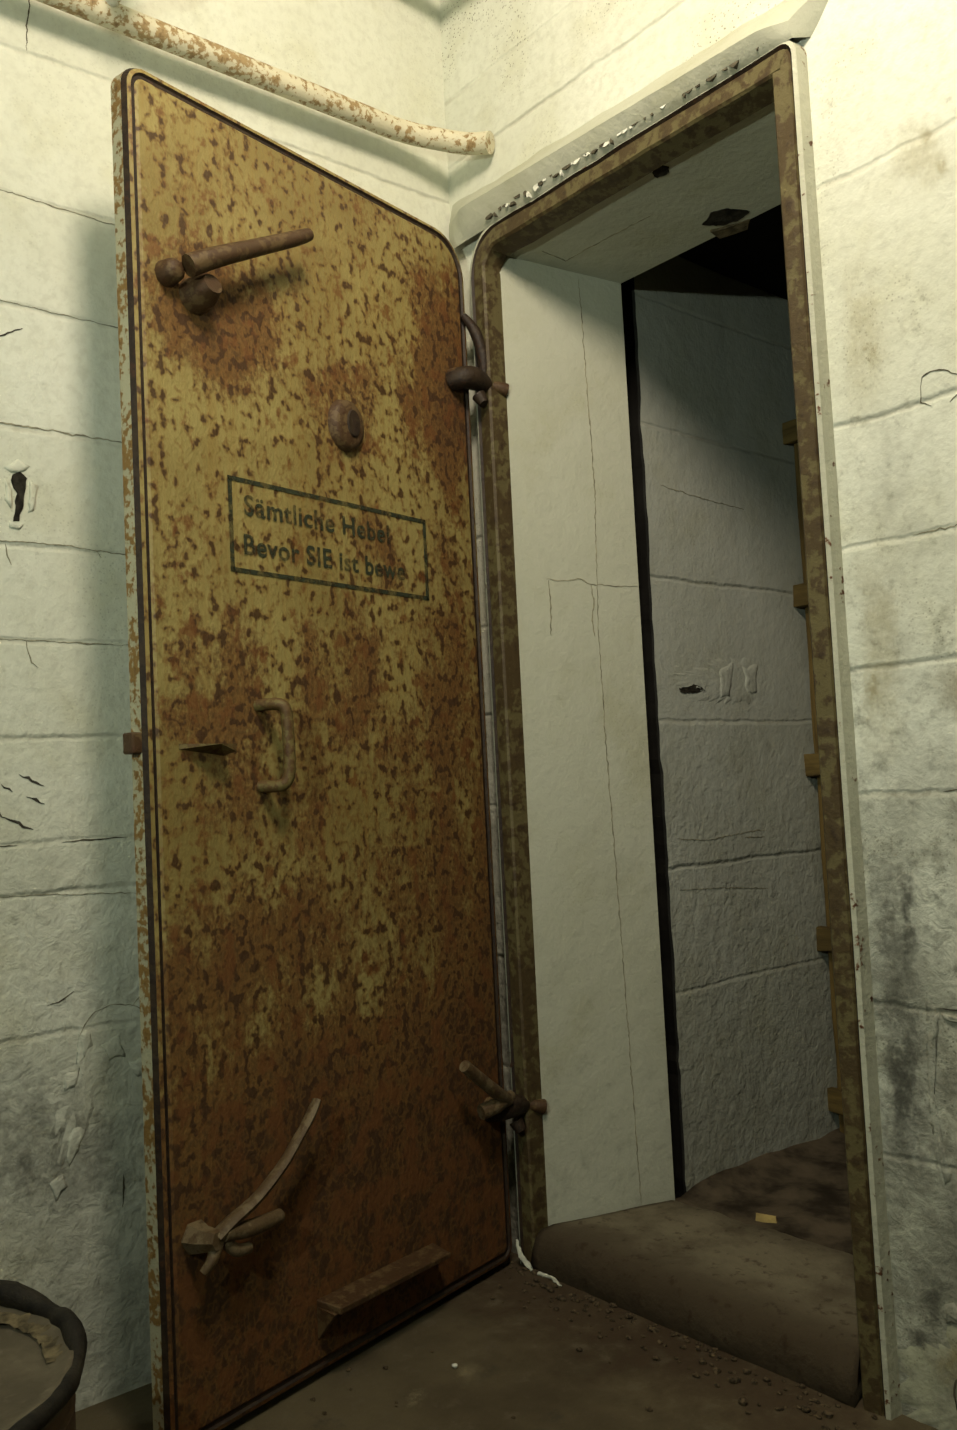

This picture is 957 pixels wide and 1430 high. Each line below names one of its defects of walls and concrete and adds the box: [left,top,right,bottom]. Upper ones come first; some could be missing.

spalling [4,459,38,530]
crack [949,1379,957,1410]